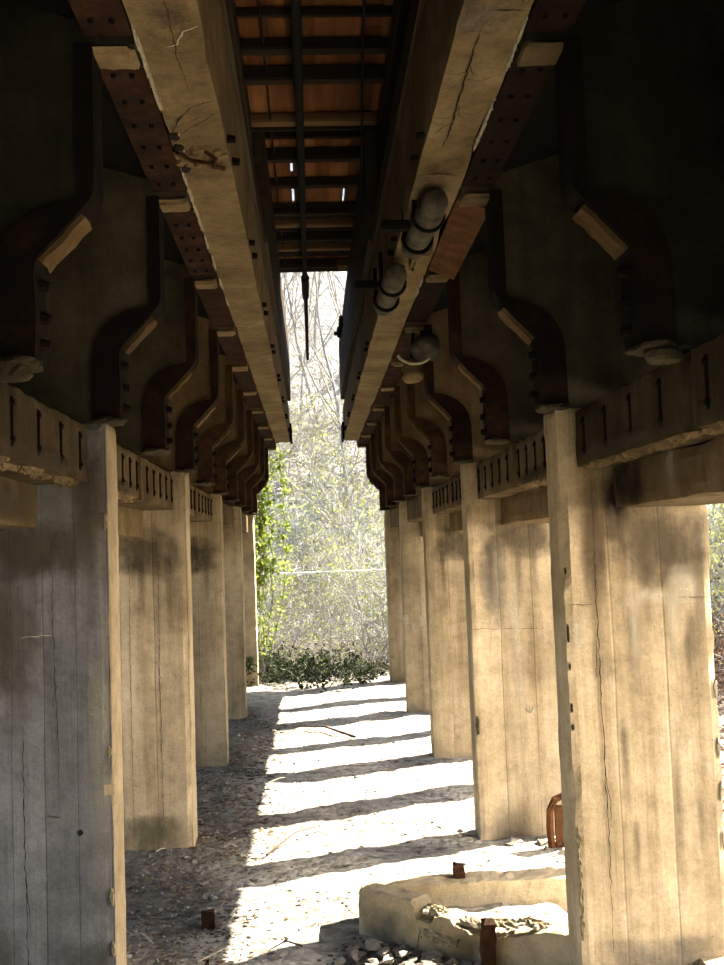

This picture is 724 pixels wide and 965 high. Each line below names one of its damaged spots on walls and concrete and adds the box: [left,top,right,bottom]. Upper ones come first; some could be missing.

crack [164,3,216,143]
crack [435,9,533,149]
peeling [504,16,528,74]
spalling [0,455,79,488]
water stain [483,523,547,607]
water stain [604,464,705,594]
crack [574,474,614,950]
crack [22,726,31,965]
spalling [421,903,553,931]